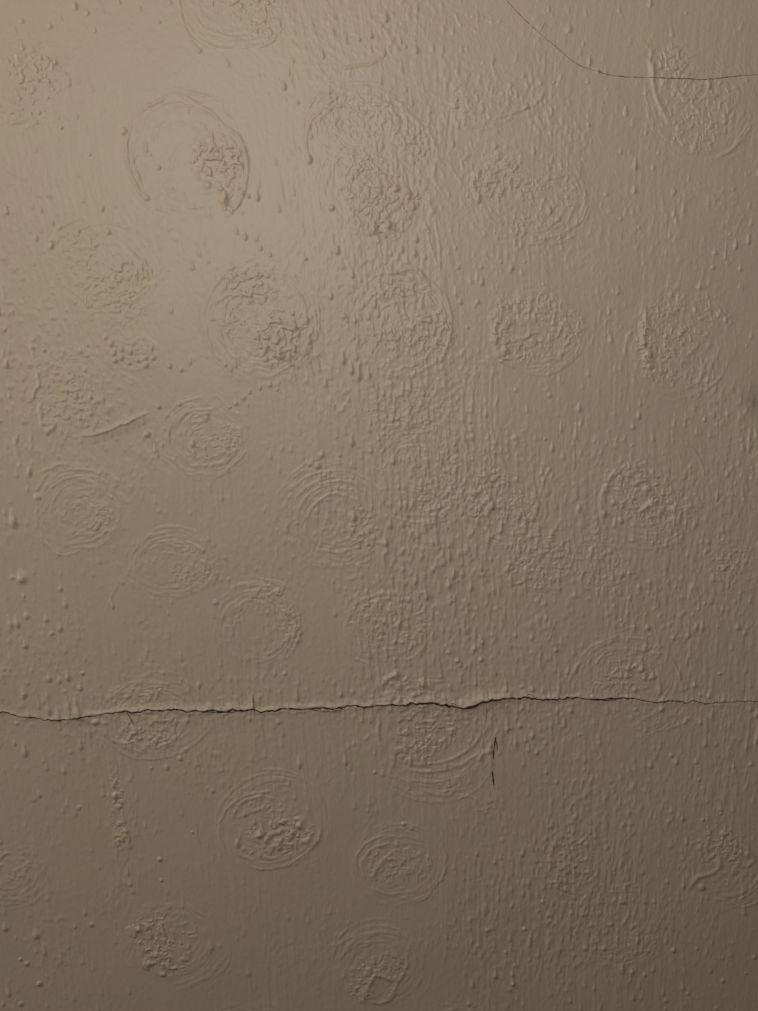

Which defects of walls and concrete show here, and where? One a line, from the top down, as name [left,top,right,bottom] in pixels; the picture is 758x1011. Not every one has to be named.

crack [0,682,758,786]